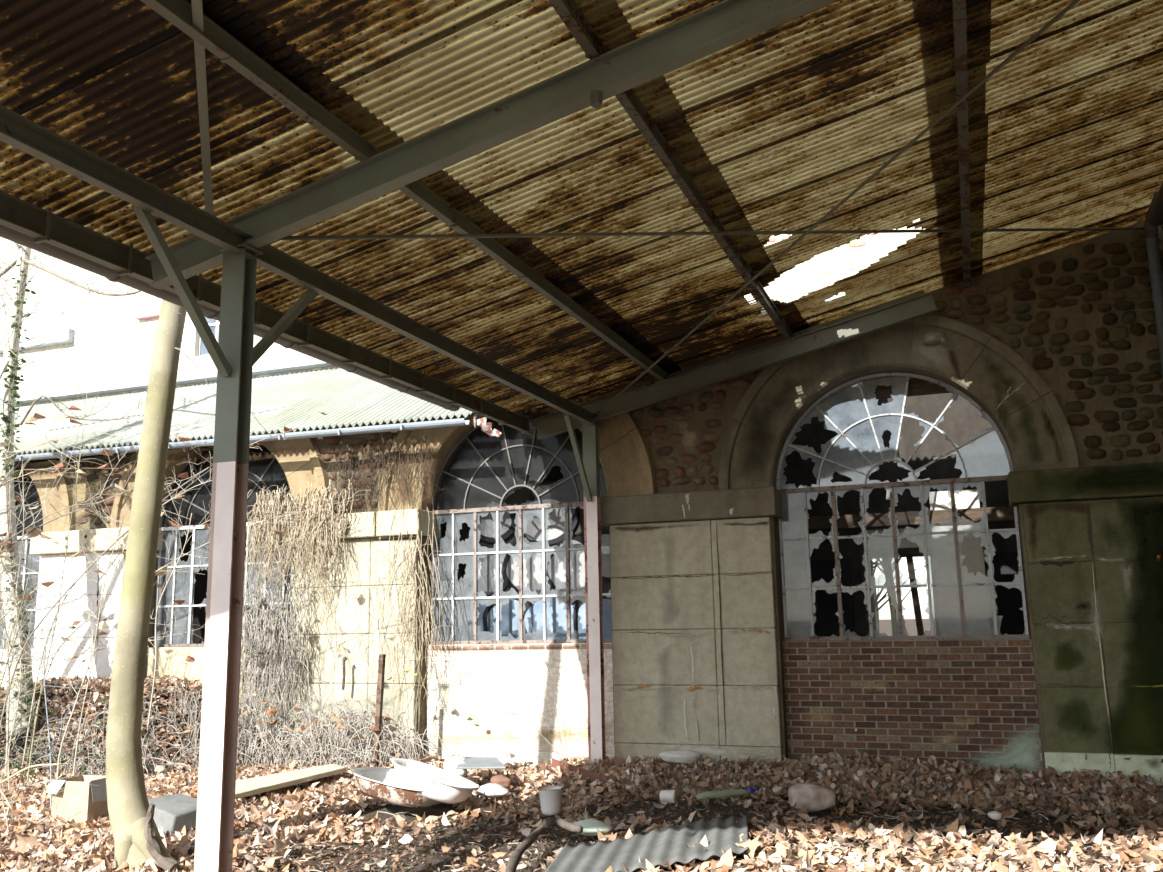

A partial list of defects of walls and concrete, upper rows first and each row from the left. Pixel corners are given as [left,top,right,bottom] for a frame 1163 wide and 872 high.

water stain [1111,502,1163,754]